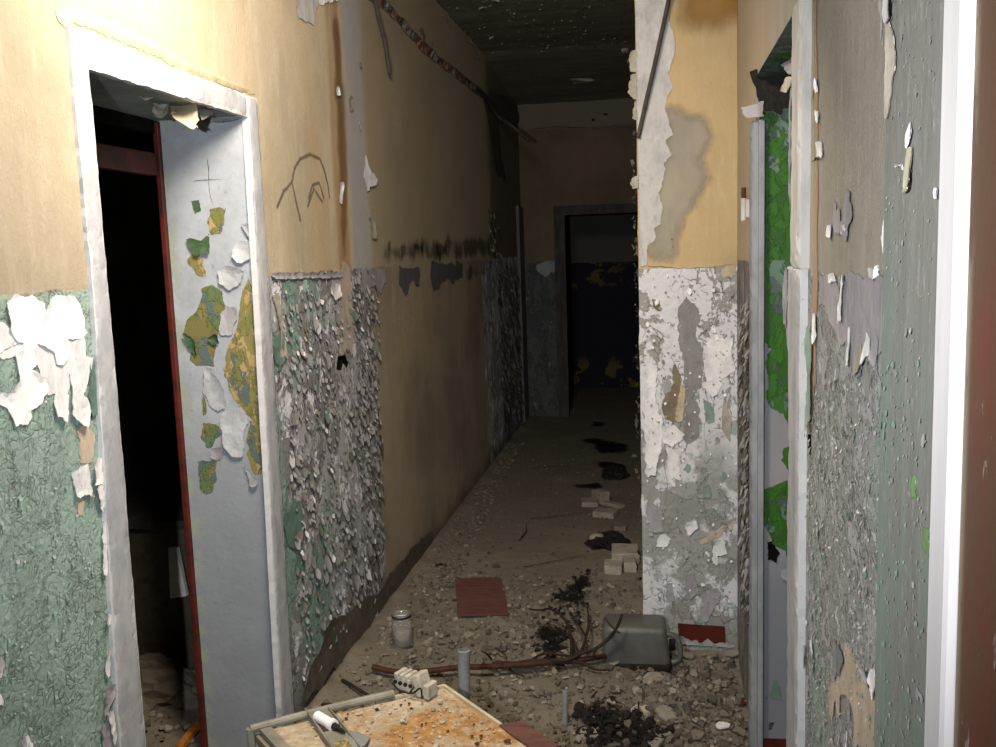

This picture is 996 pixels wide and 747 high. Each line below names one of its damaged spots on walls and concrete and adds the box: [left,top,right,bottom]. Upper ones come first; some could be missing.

damp [685,0,738,24]
peeling [632,266,749,648]
peeling [0,578,118,747]